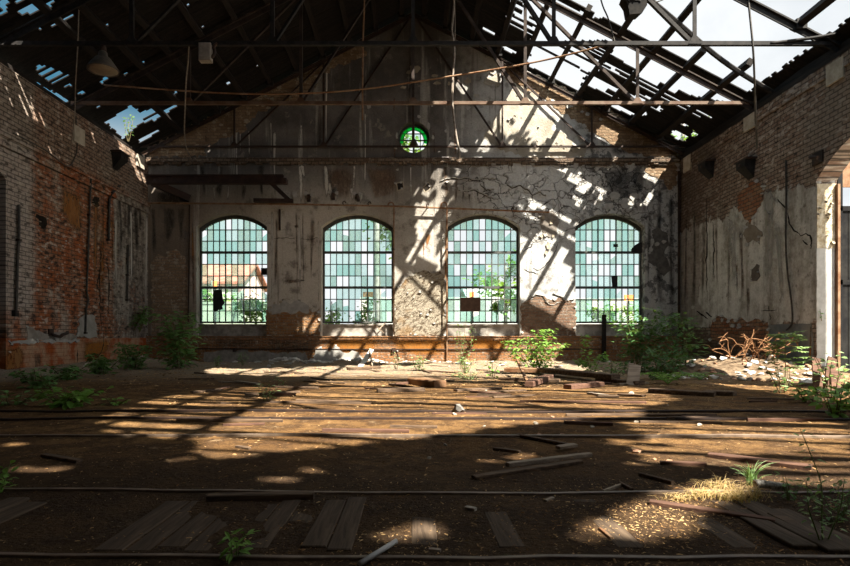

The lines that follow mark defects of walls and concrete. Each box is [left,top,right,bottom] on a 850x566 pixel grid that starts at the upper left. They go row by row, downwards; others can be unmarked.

spalling [36,214,49,229]
leakage [648,192,674,298]
spalling [734,179,766,246]
spalling [816,183,836,248]
spalling [8,314,98,353]
spalling [265,299,321,336]
spalling [392,270,446,336]
spalling [520,293,577,336]